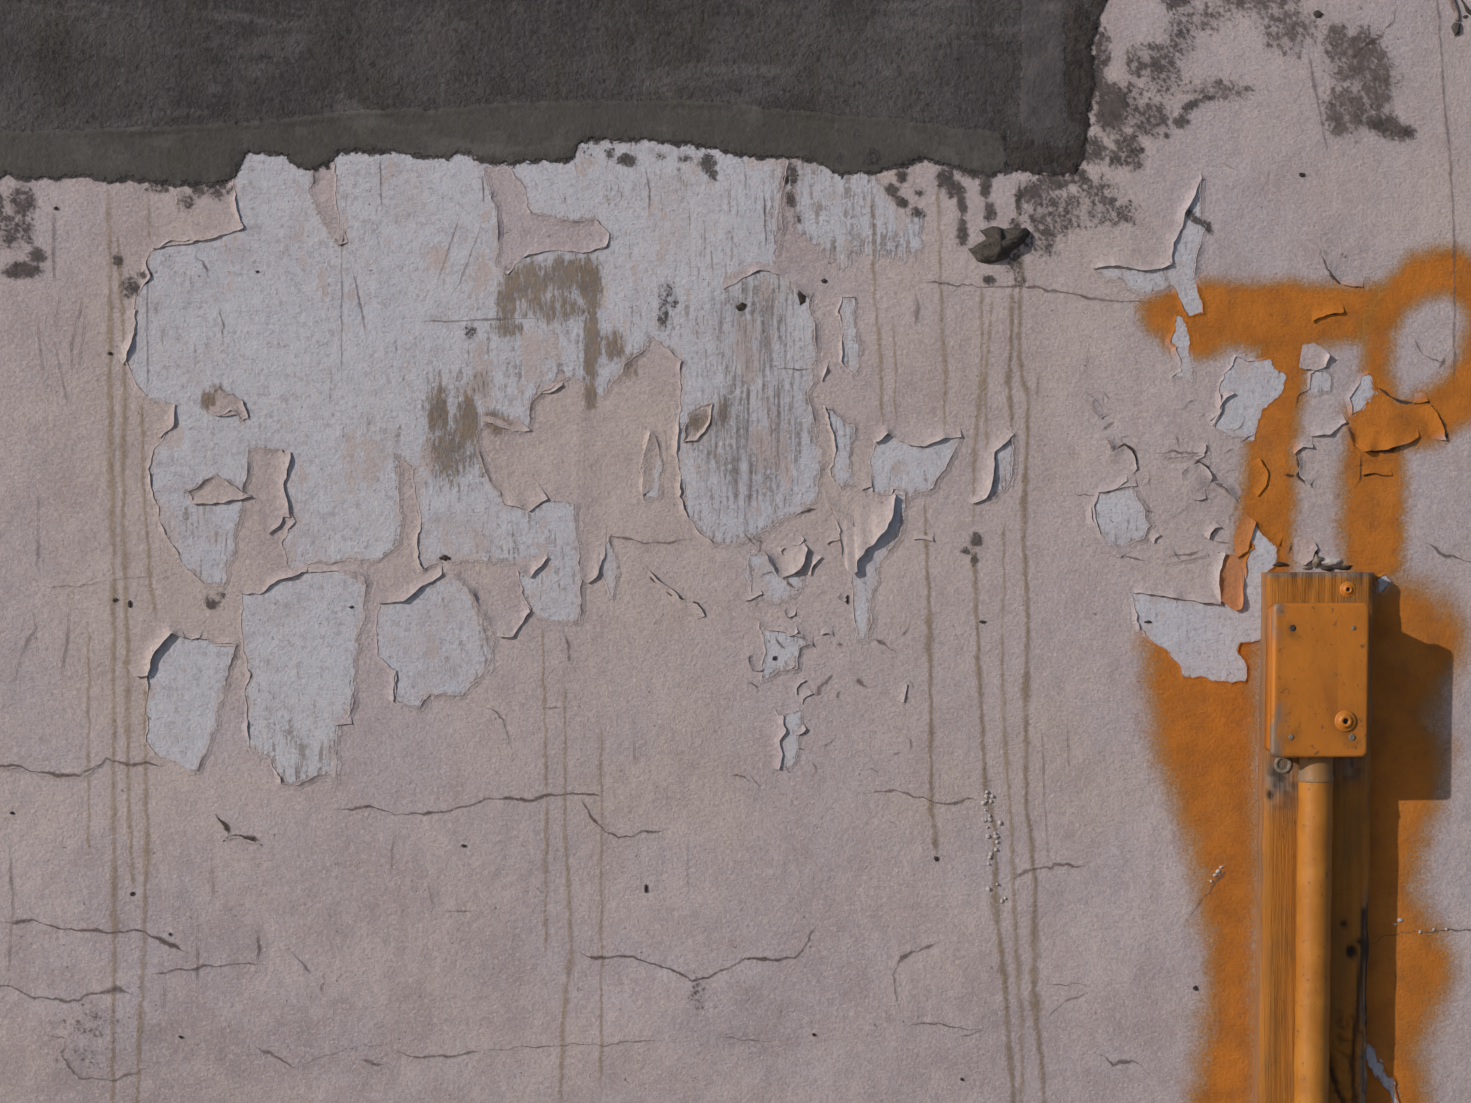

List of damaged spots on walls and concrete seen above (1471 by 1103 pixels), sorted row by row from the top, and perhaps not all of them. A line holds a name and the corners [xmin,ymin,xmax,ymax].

leakage [0,185,47,279]
peeling [1088,171,1208,387]
peeling [1205,353,1289,443]
peeling [1307,367,1382,418]
peeling [108,139,1020,791]
peeling [1085,473,1155,549]
peeling [1127,514,1286,686]
crack [0,758,158,782]
crack [348,793,659,838]
crack [8,919,260,974]
crack [585,930,813,981]
crack [0,985,129,1081]